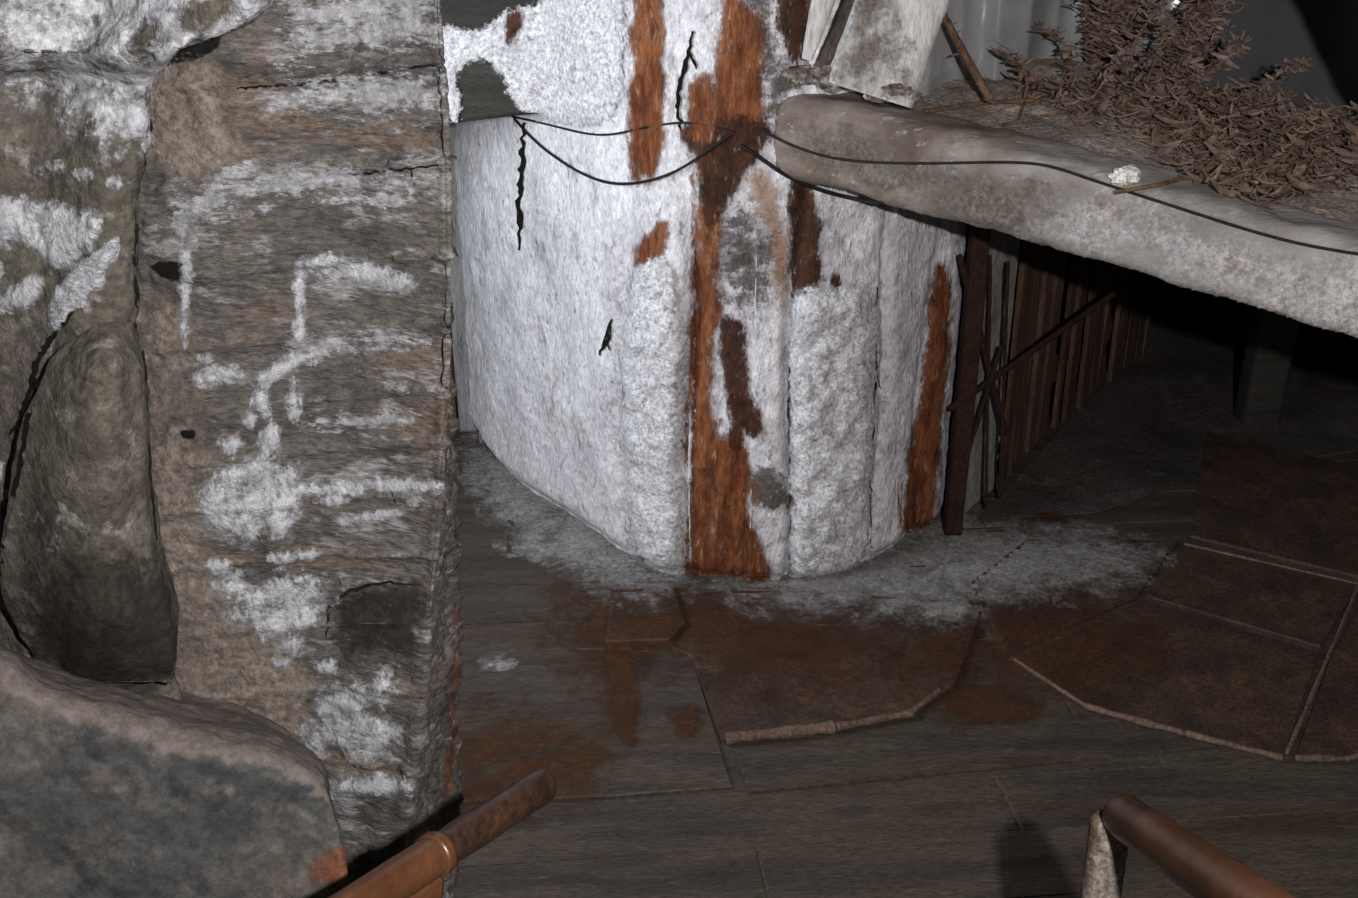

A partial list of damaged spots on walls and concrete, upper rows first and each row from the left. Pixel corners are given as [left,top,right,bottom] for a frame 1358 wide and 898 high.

leakage [0,0,629,190]
crack [675,31,697,131]
efflorescence [0,195,103,315]
crack [515,123,526,250]
corrosion [626,0,842,582]
corrosion [897,262,953,536]
efflorescence [295,659,418,800]